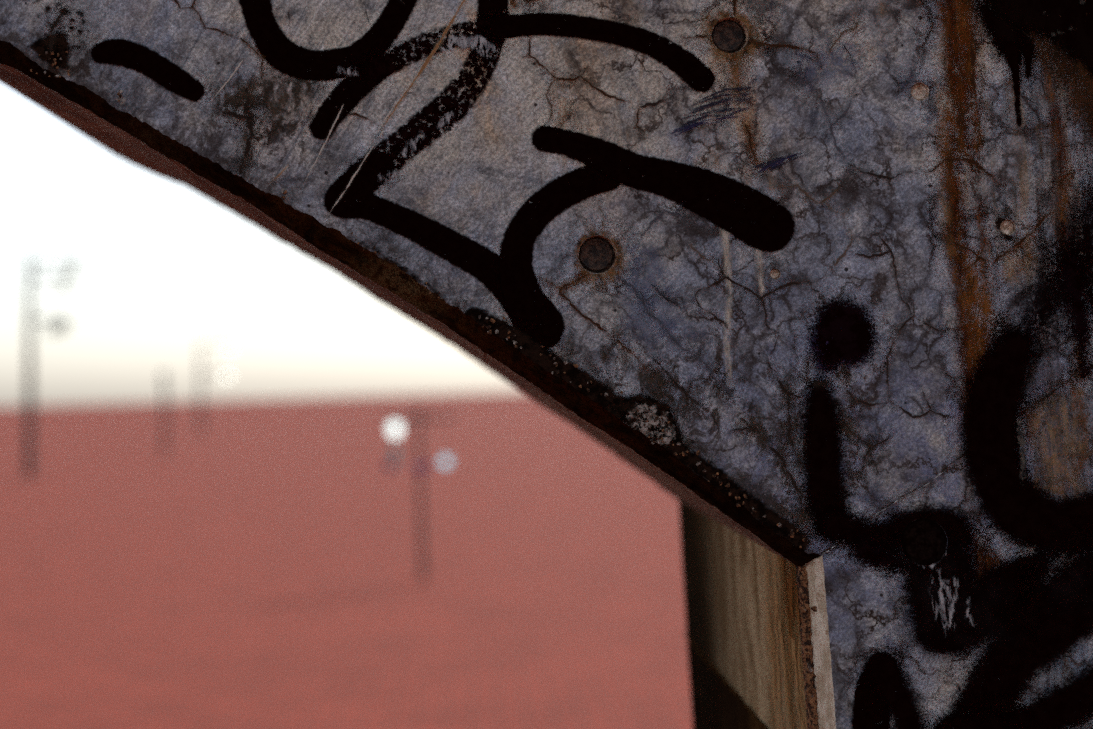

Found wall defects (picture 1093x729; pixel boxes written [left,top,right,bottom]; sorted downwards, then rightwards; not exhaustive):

crack [174,0,263,175]
rust [559,231,623,295]
crack [525,0,996,496]
rust [939,0,990,418]
crack [957,212,1052,294]